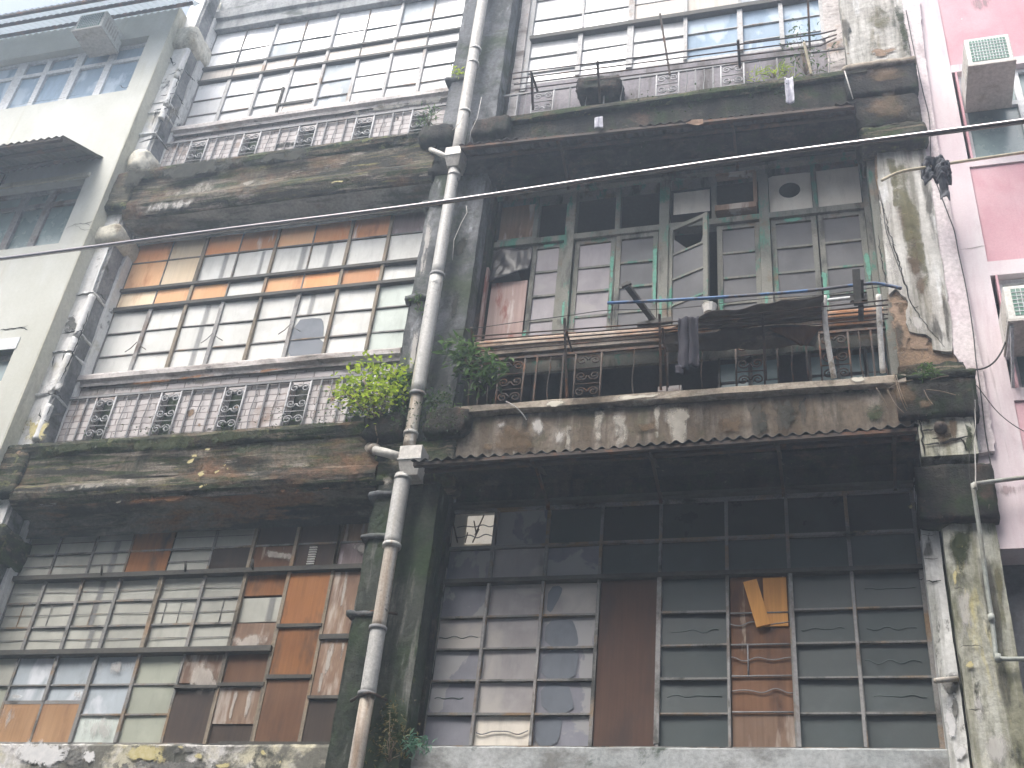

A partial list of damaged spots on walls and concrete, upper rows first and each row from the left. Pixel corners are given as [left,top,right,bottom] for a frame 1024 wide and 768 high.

water stain [123,148,316,187]
water stain [886,159,933,292]
spalling [887,292,932,353]
water stain [932,299,949,342]
water stain [576,406,689,443]
water stain [979,559,1003,647]
water stain [998,663,1010,702]
peeling [9,742,95,767]
spalling [113,745,239,768]